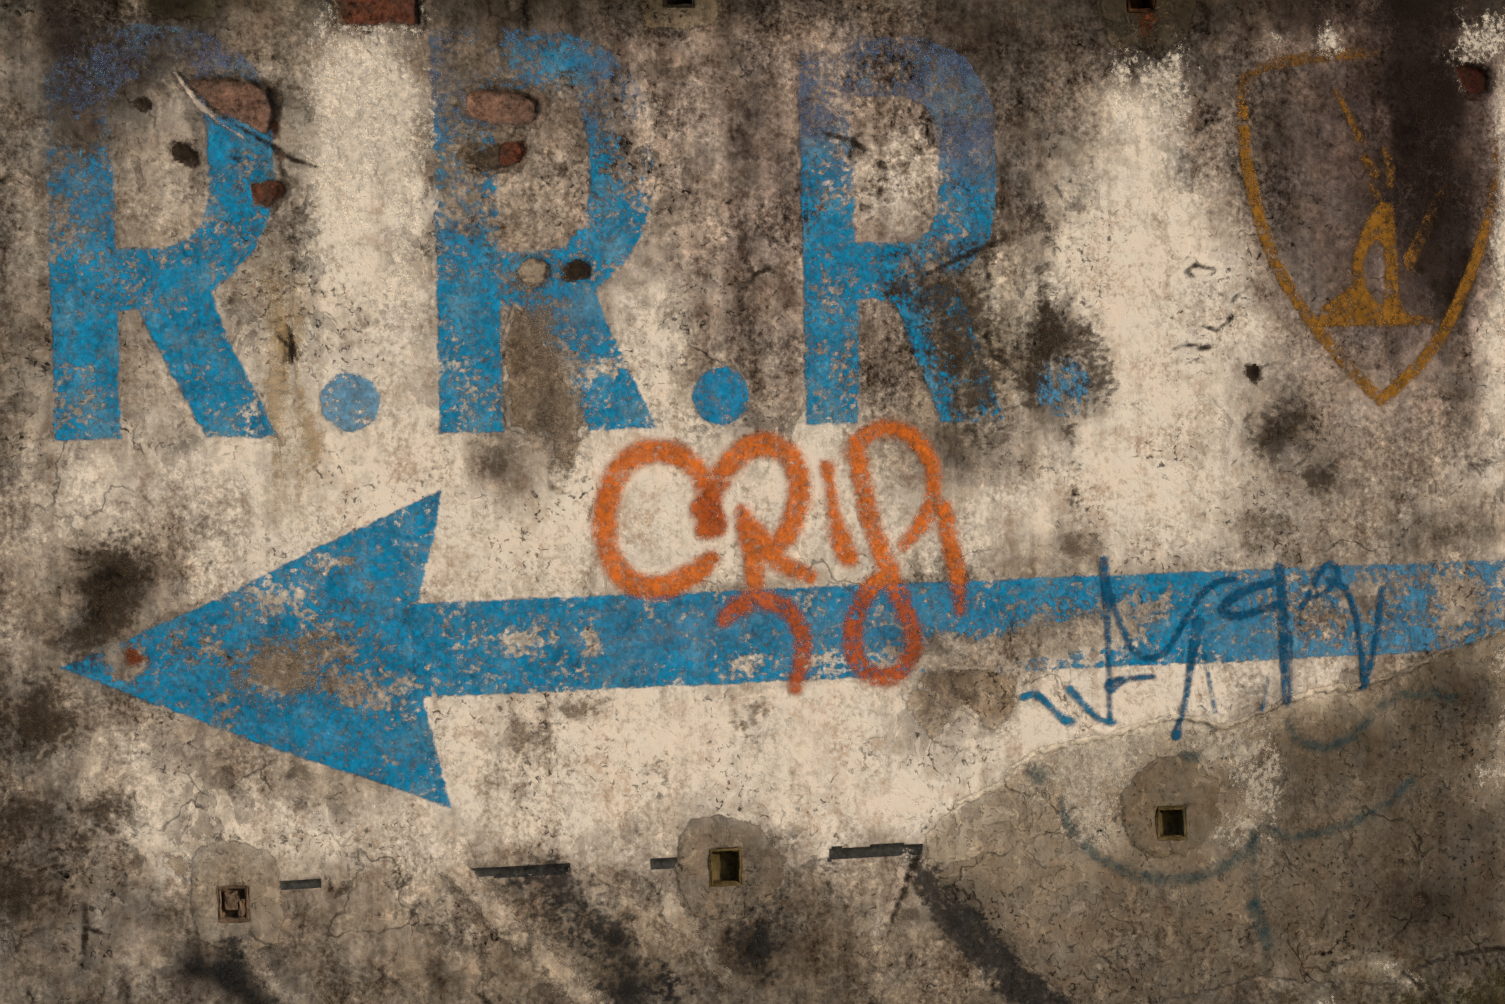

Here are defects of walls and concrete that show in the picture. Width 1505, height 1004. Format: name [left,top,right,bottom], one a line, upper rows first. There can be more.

spalling [330,0,427,34]
spalling [168,140,201,168]
spalling [177,70,284,139]
crack [174,71,317,193]
spalling [229,155,298,215]
spalling [456,79,550,178]
spalling [1453,58,1498,104]
leakage [1452,12,1505,335]
peeling [902,664,1022,739]
spalling [921,626,1505,1004]
leakage [907,847,1070,1004]